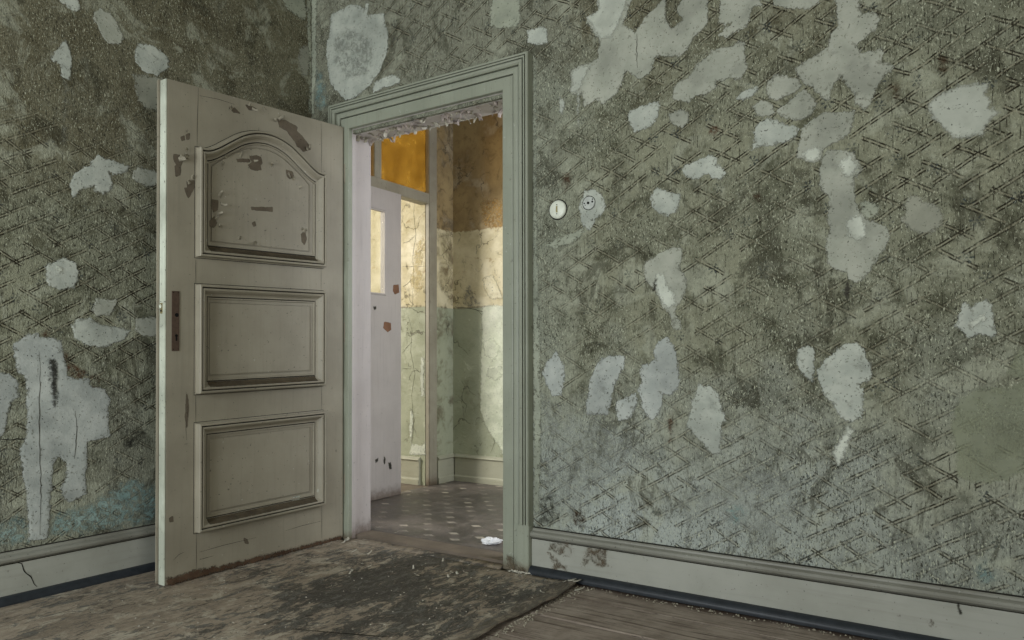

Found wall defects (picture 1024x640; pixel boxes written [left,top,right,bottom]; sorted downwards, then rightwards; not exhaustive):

flaking render [69,155,157,197]
peeling [173,133,195,198]
peeling [237,155,274,171]
peeling [277,119,311,152]
flaking render [326,3,400,100]
flaking render [570,0,820,133]
flaking render [736,0,894,296]
flaking render [929,83,997,138]
flaking render [586,247,687,421]
flaking render [0,298,156,541]
flaking render [686,384,726,454]
flaking render [796,342,872,466]